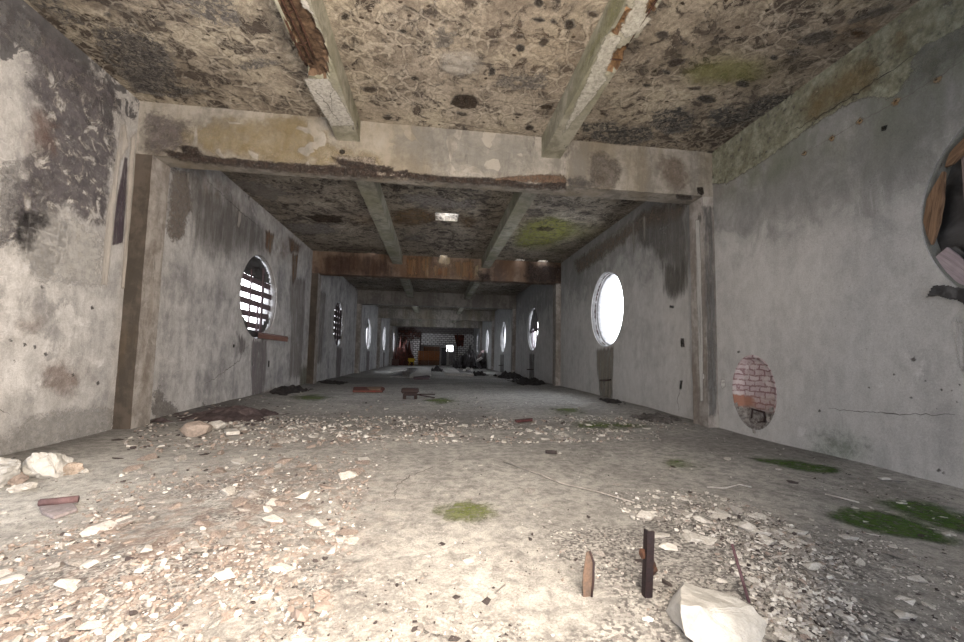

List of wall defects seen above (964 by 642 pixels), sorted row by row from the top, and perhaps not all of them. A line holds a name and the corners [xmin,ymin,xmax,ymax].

spalling [170,0,245,28]
spalling [233,57,282,71]
spalling [278,0,354,126]
peeling [563,0,964,200]
damp [0,19,186,288]
damp [524,263,561,284]
damp [576,205,717,416]
spalling [732,351,777,434]
crack [834,408,955,416]